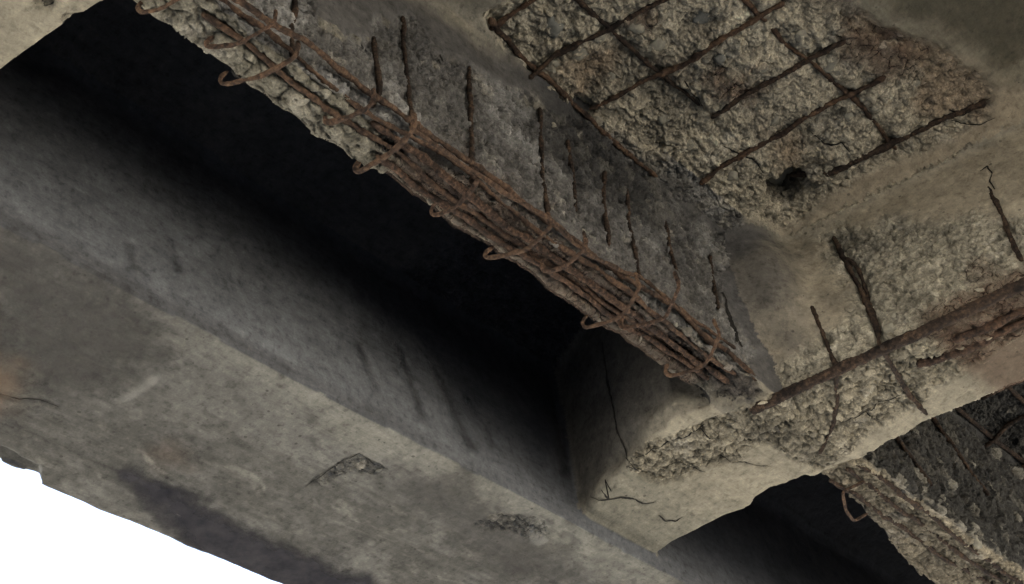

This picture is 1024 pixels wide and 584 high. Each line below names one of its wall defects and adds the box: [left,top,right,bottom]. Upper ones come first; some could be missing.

spalling [309,455,385,486]
spalling [134,0,992,366]
crack [590,342,771,522]
spalling [388,148,1024,584]